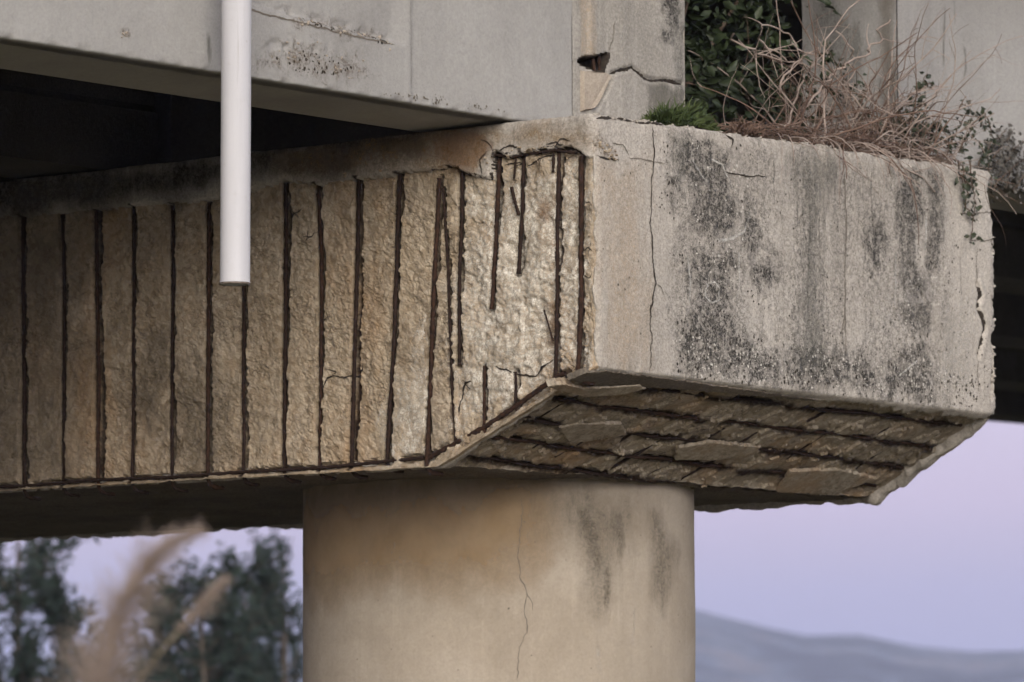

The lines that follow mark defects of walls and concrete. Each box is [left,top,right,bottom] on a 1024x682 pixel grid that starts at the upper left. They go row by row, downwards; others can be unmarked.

crack [251,9,394,45]
crack [609,23,681,85]
spalling [0,113,996,501]
crack [613,128,666,367]
leakage [670,139,778,290]
leakage [678,246,935,405]
leakage [864,171,944,330]
crack [517,499,533,678]